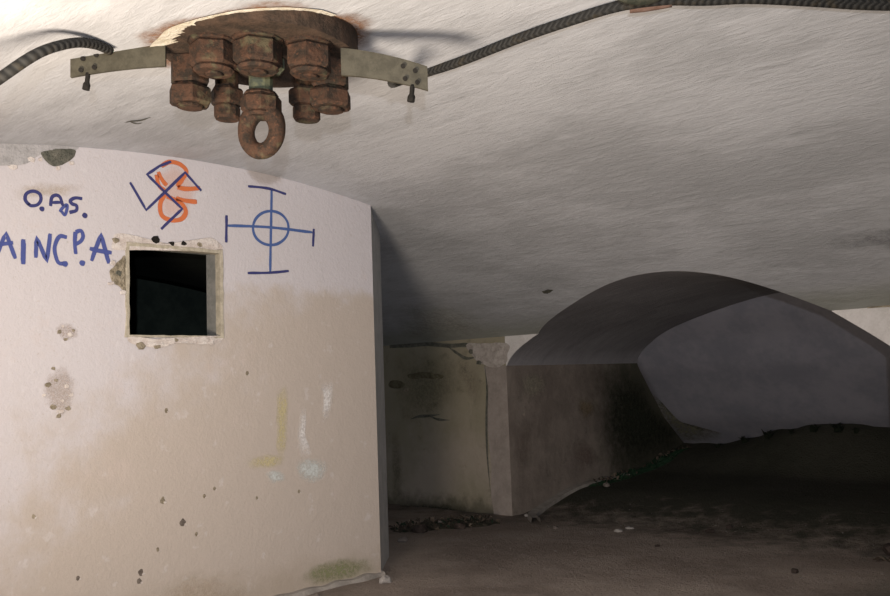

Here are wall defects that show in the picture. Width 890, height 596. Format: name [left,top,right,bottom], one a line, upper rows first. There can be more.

flaking render [0,144,79,170]
flaking render [107,233,223,294]
flaking render [127,336,224,349]
peeling [42,367,74,418]